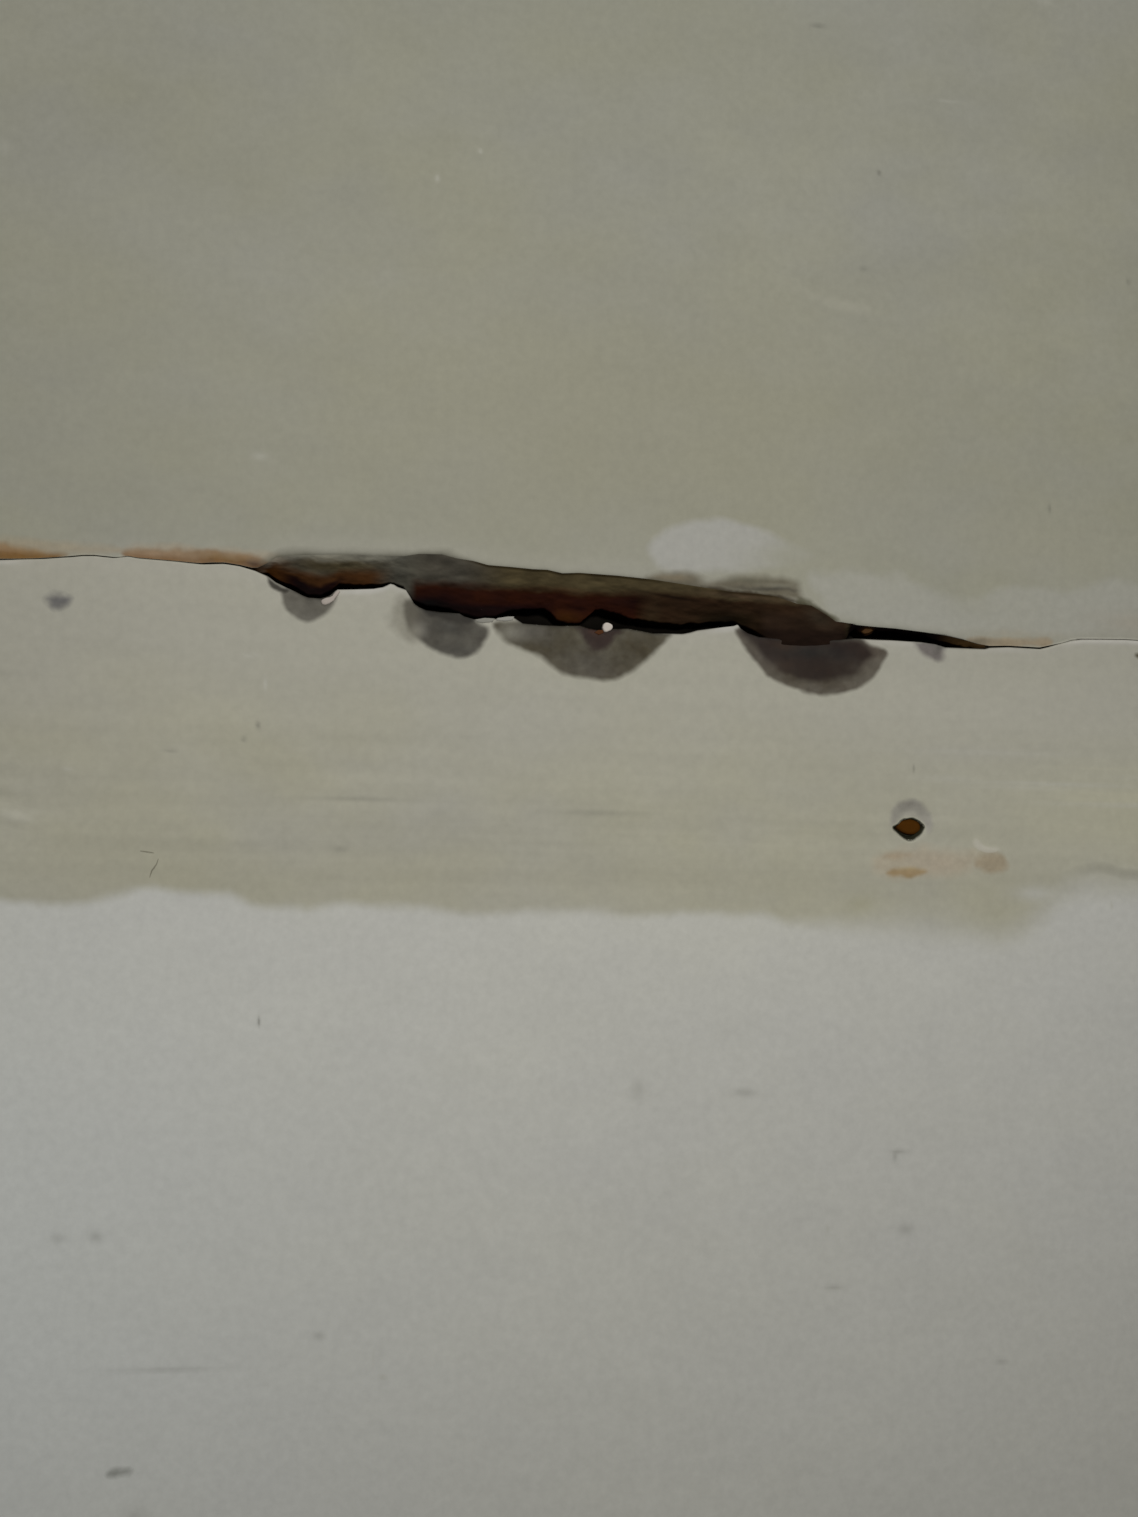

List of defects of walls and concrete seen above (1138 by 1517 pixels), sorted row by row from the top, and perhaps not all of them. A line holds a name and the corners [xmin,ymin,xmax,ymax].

rust [0,533,271,568]
leakage [382,592,674,683]
crack [0,554,1078,649]
leakage [642,568,890,698]